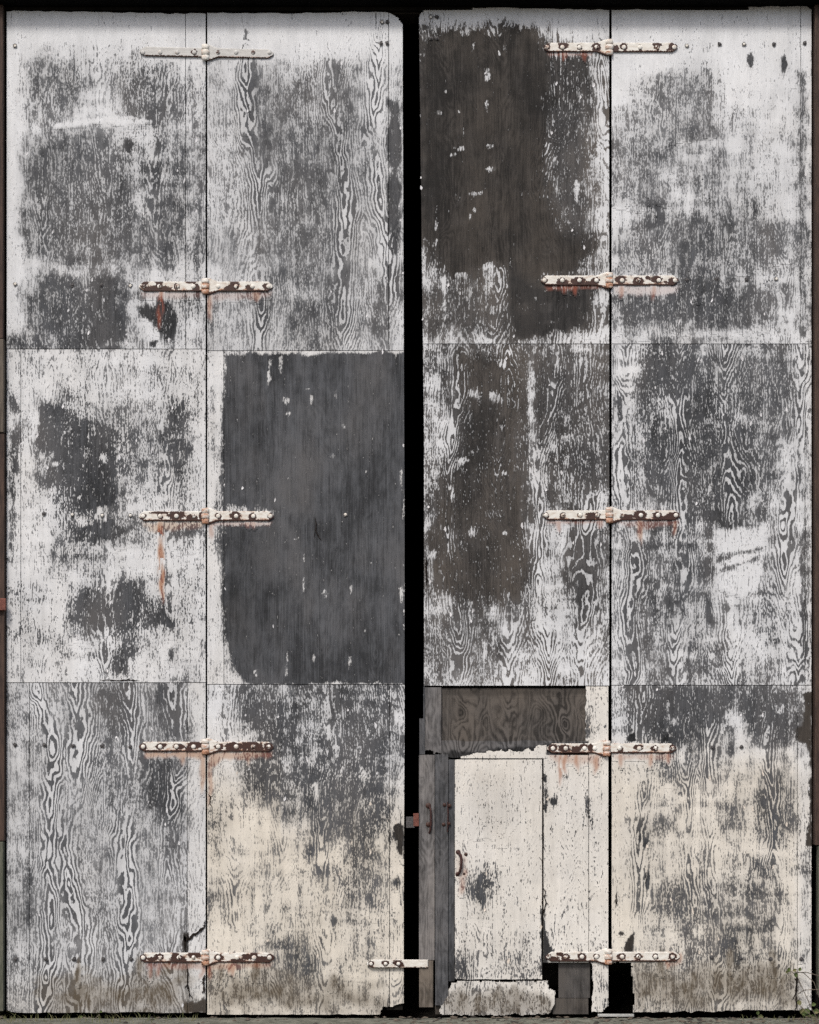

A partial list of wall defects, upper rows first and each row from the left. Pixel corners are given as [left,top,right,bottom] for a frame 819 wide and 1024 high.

peeling [7,39,206,349]
corrosion [541,277,681,304]
peeling [419,12,812,686]
peeling [7,96,405,930]
corrosion [140,512,275,606]
corrosion [543,512,681,548]
peeling [556,524,811,894]
corrosion [140,737,275,811]
corrosion [546,745,678,790]
peeling [7,876,53,940]
peeling [642,868,749,957]
crack [183,922,205,1001]